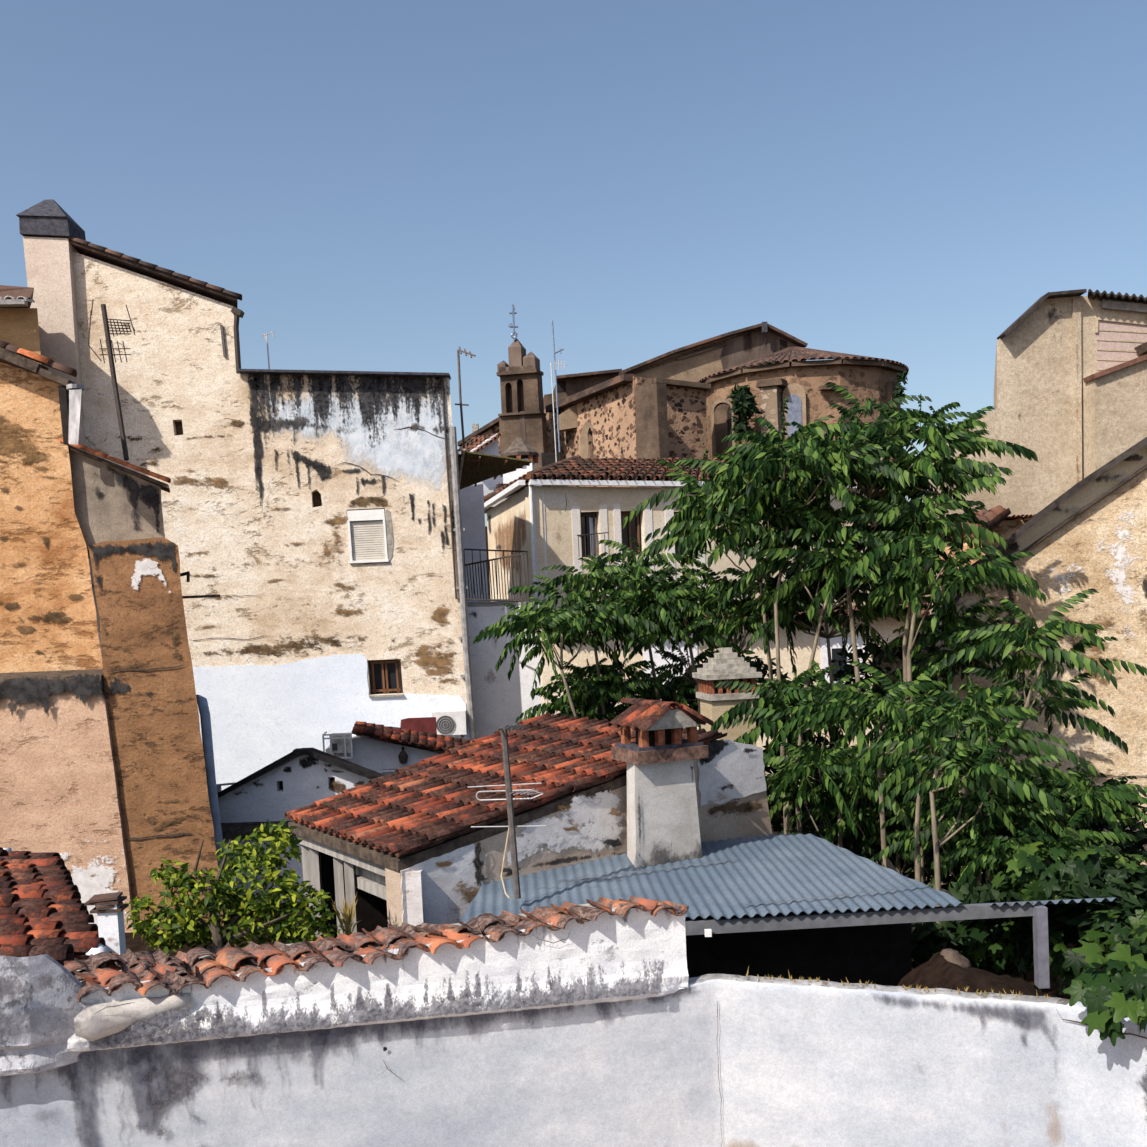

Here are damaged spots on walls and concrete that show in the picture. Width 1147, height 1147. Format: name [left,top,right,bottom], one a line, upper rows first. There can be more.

water stain [247,374,450,505]
water stain [88,466,177,589]
peeling [131,558,171,593]
peeling [1046,564,1084,599]
peeling [1067,510,1142,695]
peeling [503,790,624,868]
water stain [648,987,694,1002]
water stain [57,1000,628,1147]